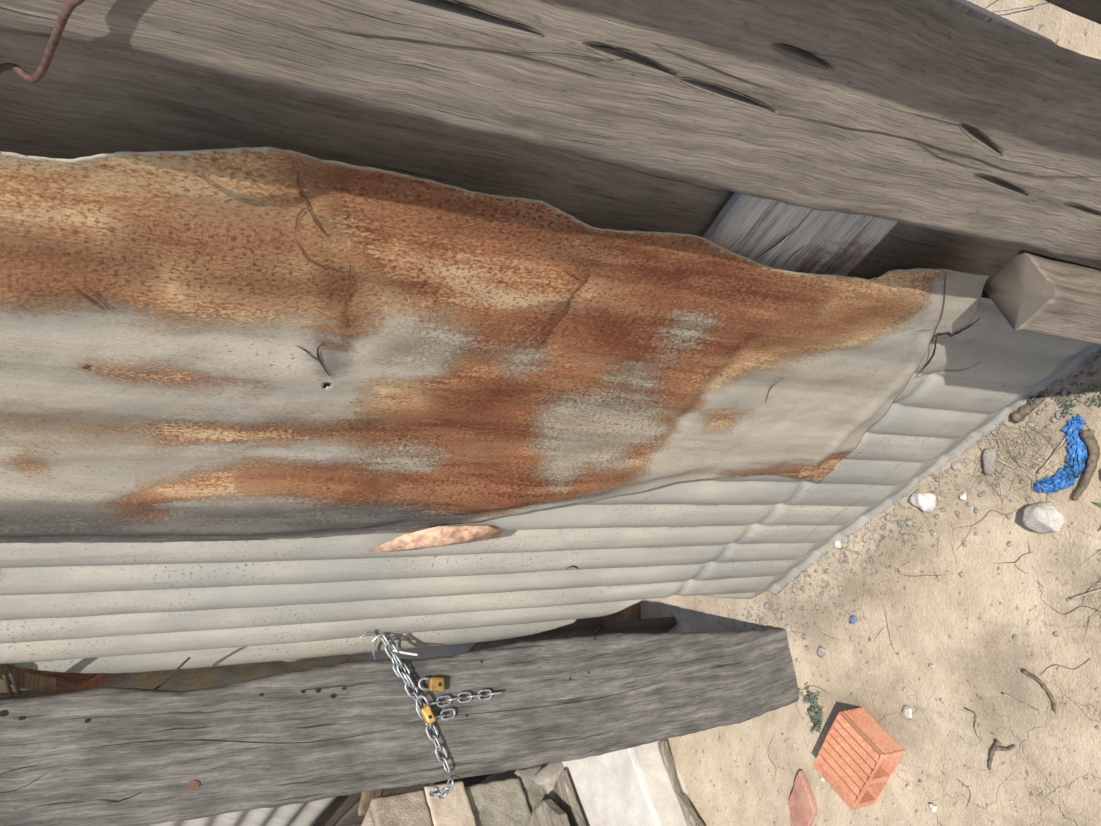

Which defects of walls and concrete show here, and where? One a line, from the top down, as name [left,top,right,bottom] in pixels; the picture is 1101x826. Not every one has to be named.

crack [295,171,381,376]
corrosion [0,149,953,519]
crack [917,271,980,378]